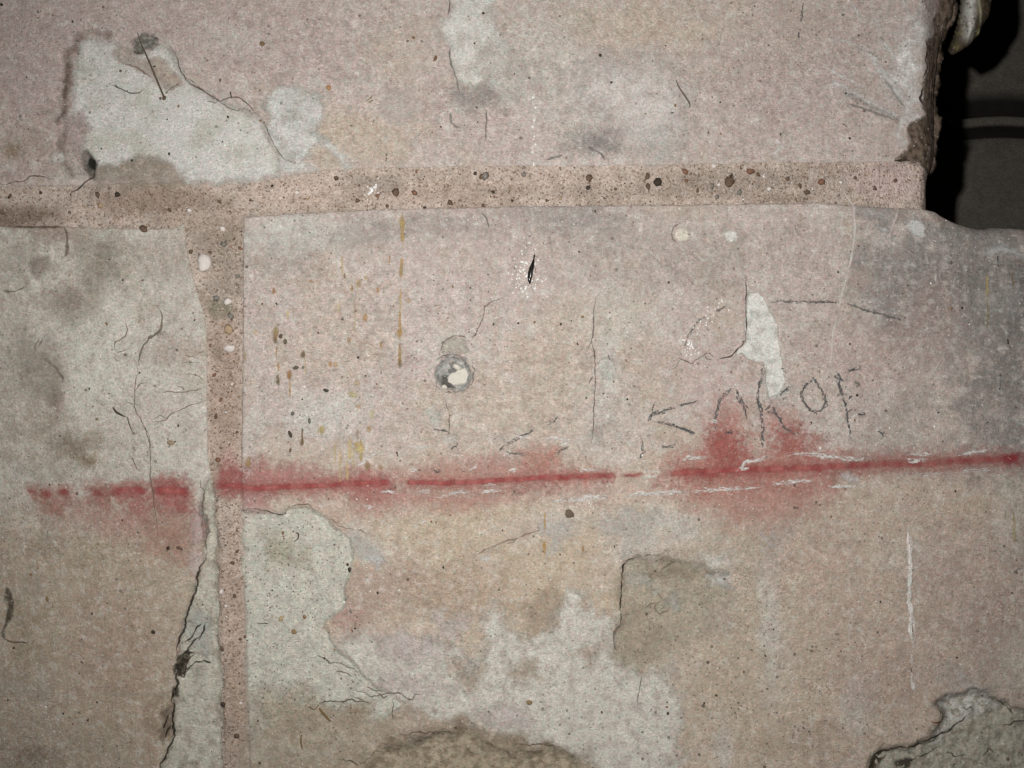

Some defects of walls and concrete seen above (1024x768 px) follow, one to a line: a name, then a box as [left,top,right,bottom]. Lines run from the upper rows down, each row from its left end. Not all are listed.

peeling [68,39,351,193]
peeling [439,0,533,99]
peeling [718,282,786,403]
crack [114,310,205,533]
crack [160,483,211,768]
peeling [240,503,724,768]
spalling [868,664,1024,768]